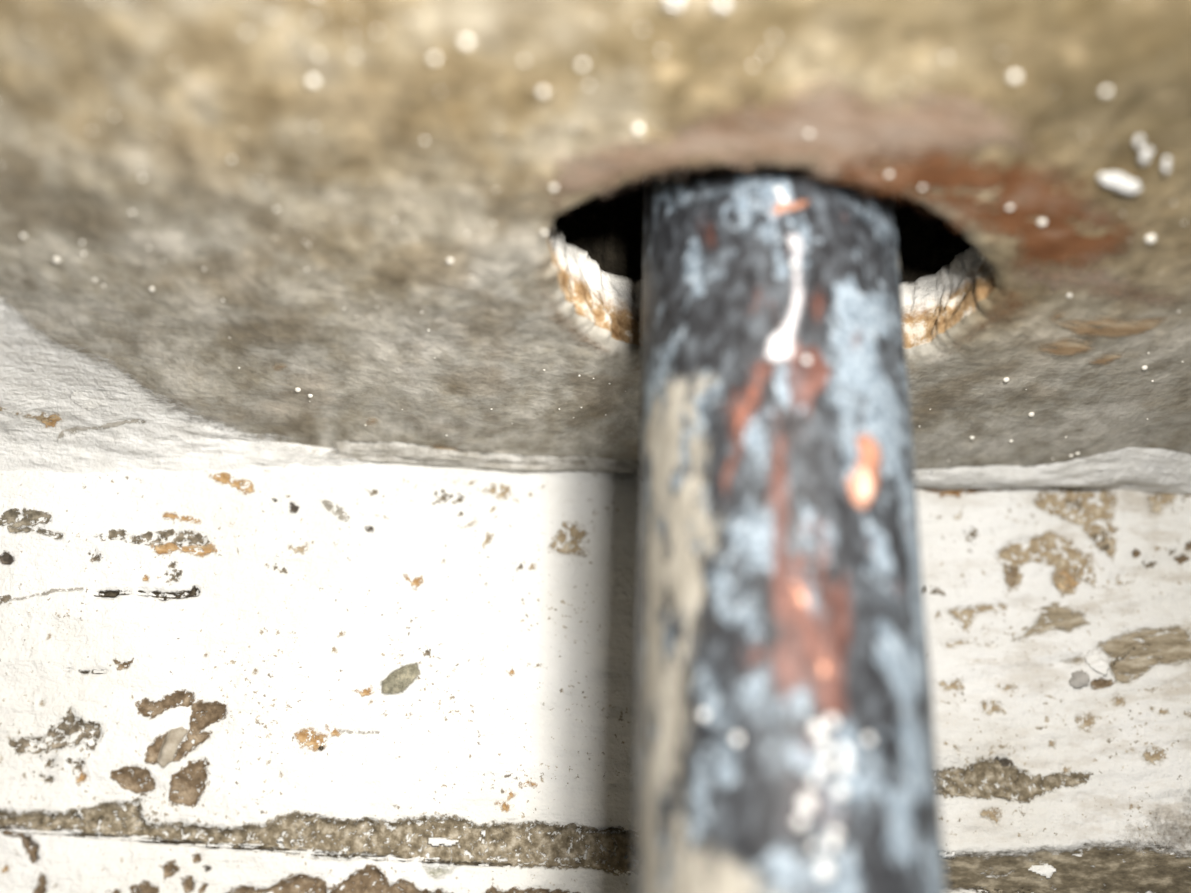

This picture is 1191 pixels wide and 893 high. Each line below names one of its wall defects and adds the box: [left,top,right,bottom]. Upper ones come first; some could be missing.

corrosion [555,83,1175,364]
spalling [0,508,63,539]
spalling [999,488,1117,639]
spalling [937,603,1006,647]
peeling [939,681,965,690]
spalling [1065,626,1191,705]
spalling [9,706,101,784]
spalling [110,690,227,807]
spalling [937,745,1093,823]
peeling [1144,747,1166,764]
peeling [428,837,459,847]
peeling [1028,863,1056,878]